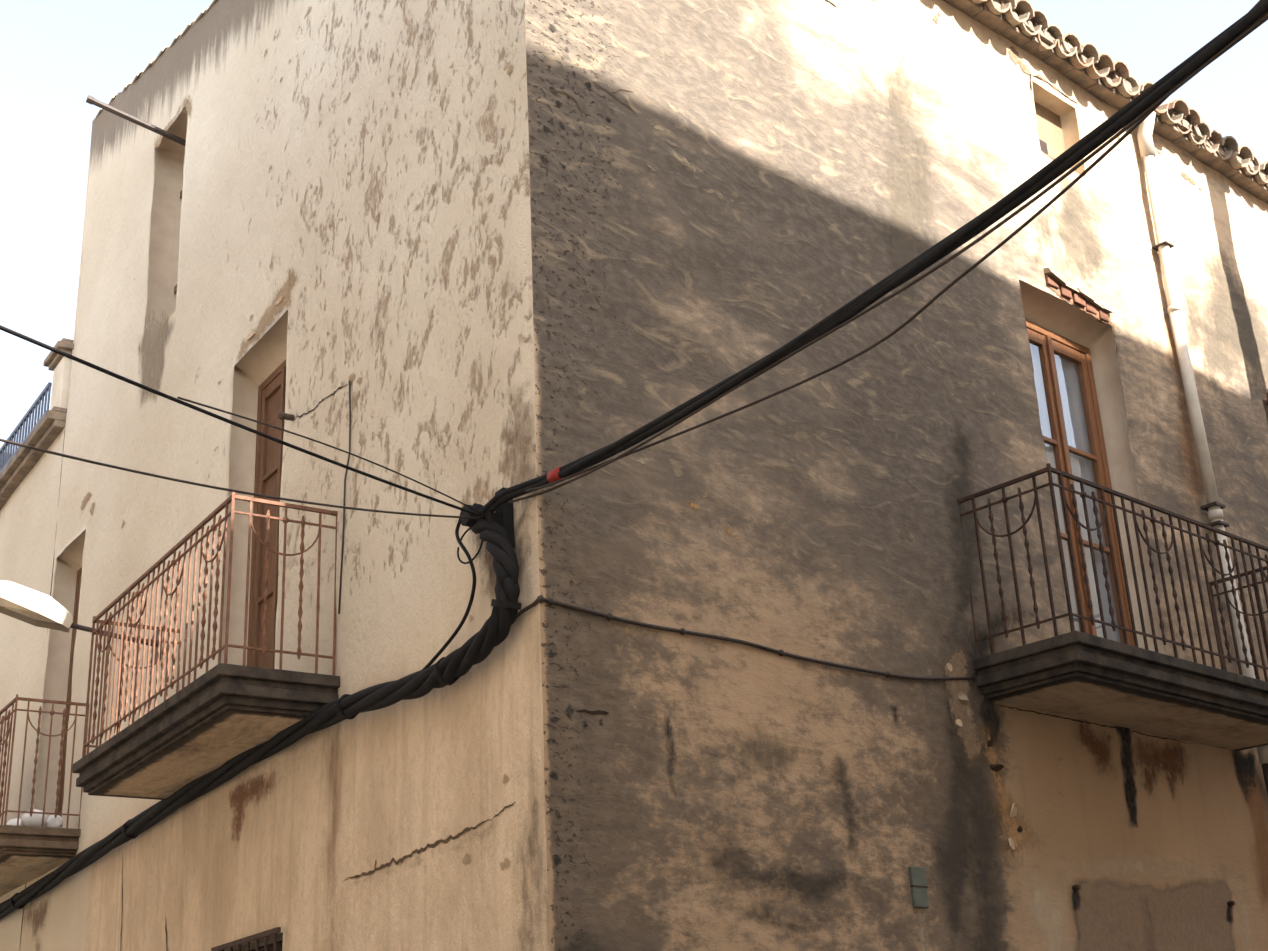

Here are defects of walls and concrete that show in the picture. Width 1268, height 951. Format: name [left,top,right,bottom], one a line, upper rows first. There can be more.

flaking render [1043,268,1119,350]
leakage [948,427,976,601]
crack [344,801,516,881]
leakage [938,732,999,951]
flaking render [943,645,1031,850]
leakage [1116,726,1138,827]